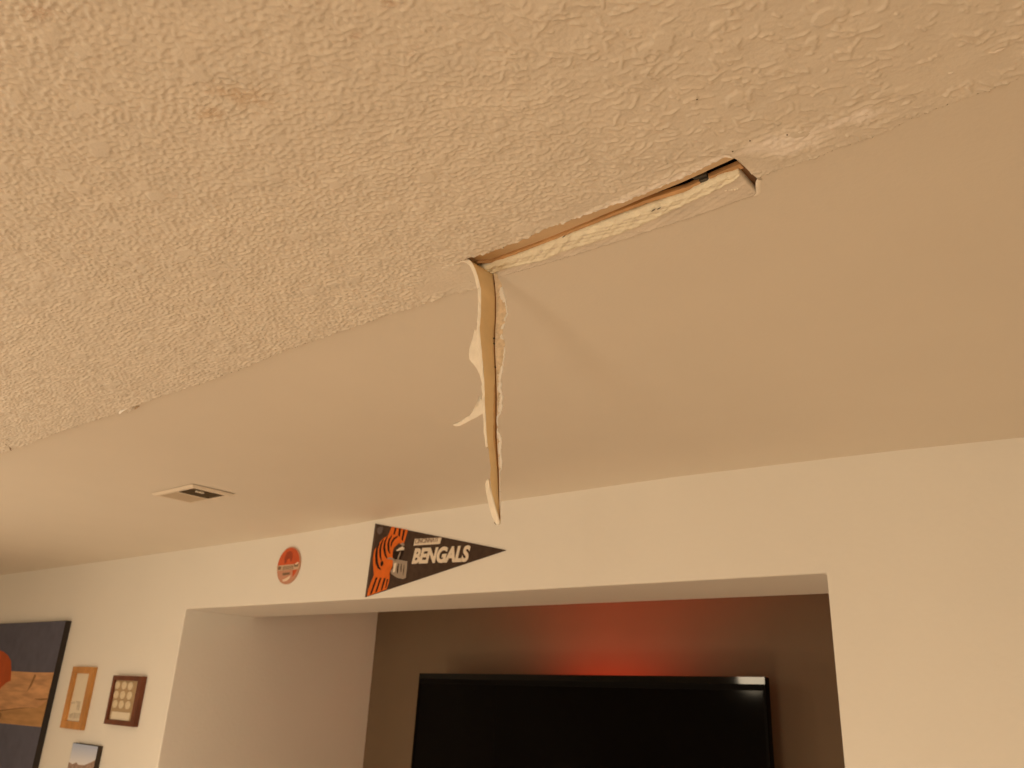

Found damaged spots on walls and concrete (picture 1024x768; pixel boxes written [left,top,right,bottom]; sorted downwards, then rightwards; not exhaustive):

peeling [469,329,482,382]
peeling [453,396,483,426]